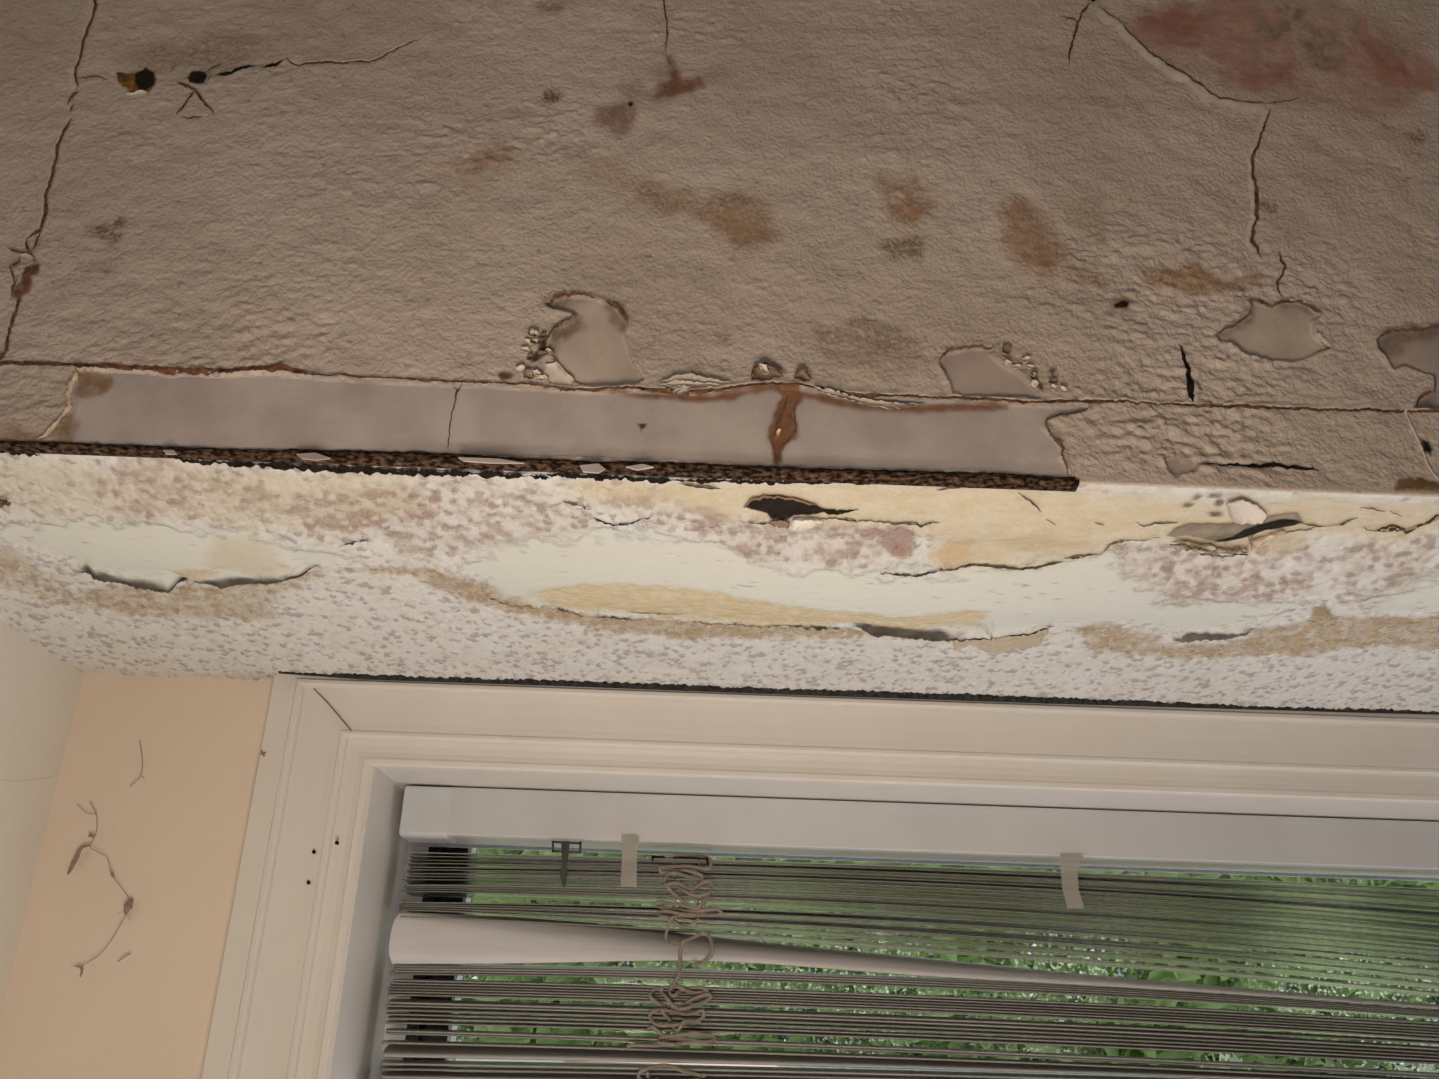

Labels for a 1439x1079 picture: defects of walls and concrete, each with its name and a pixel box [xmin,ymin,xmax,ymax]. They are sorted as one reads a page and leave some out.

crack [215,34,423,83]
rust [660,59,700,95]
crack [25,0,108,239]
crack [1060,0,1298,297]
leakage [1004,202,1062,273]
peeling [38,292,1089,479]
crack [0,297,1439,448]
rust [636,384,1001,464]
peeling [1216,299,1330,362]
peeling [1377,325,1439,409]
peeling [1226,499,1267,525]
peeling [953,630,1048,653]